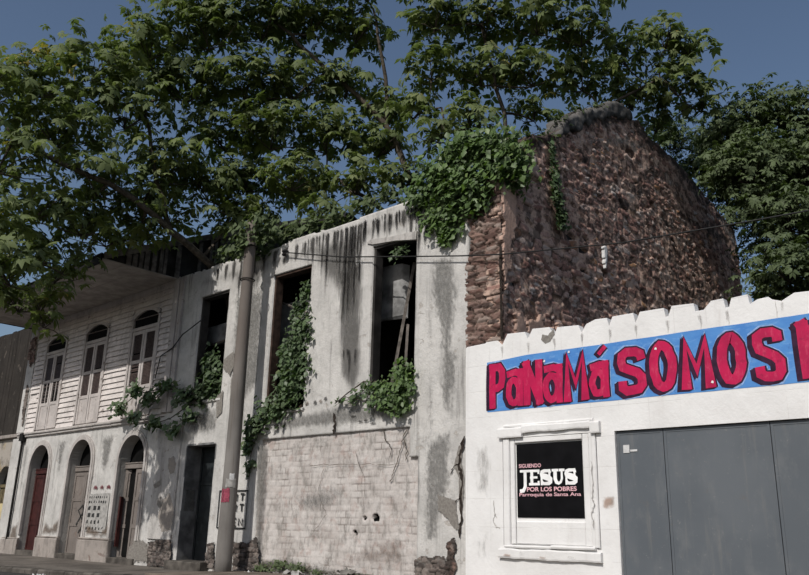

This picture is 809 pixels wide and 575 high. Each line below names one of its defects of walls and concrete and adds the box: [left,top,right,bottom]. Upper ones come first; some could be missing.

leakage [214,260,243,339]
leakage [245,293,261,391]
leakage [253,208,429,386]
leakage [434,260,453,404]
spalling [127,479,174,567]
crack [311,427,408,529]
spalling [414,445,464,575]
crack [451,436,465,538]